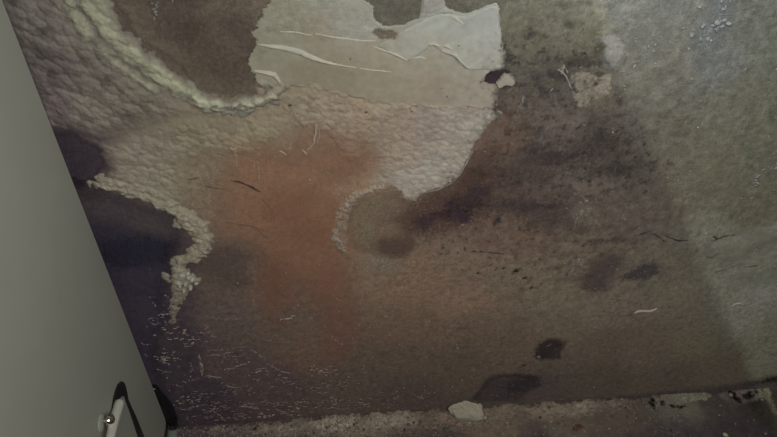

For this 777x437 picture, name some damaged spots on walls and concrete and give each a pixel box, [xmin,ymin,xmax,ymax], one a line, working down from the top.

peeling [248,0,515,163]
leakage [682,0,733,50]
leakage [350,32,651,273]
peeling [143,302,399,425]
leakage [536,339,564,359]